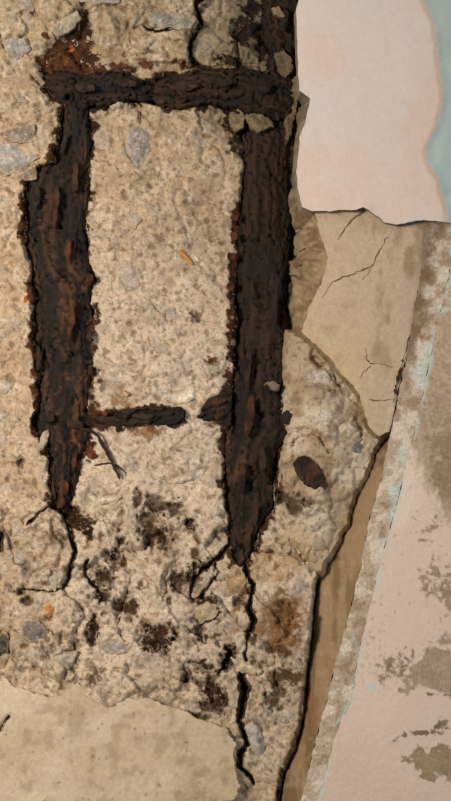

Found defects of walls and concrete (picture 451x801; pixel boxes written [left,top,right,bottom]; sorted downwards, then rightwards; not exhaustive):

rust [34,2,249,170]
crack [188,0,204,63]
rust [24,272,93,542]
crack [21,505,102,605]
rust [71,269,187,481]
spalling [0,0,319,801]
crack [189,538,231,602]
rust [204,201,255,436]
crack [218,561,256,785]
rust [208,421,276,594]
crack [276,578,321,801]
peeling [274,0,451,801]